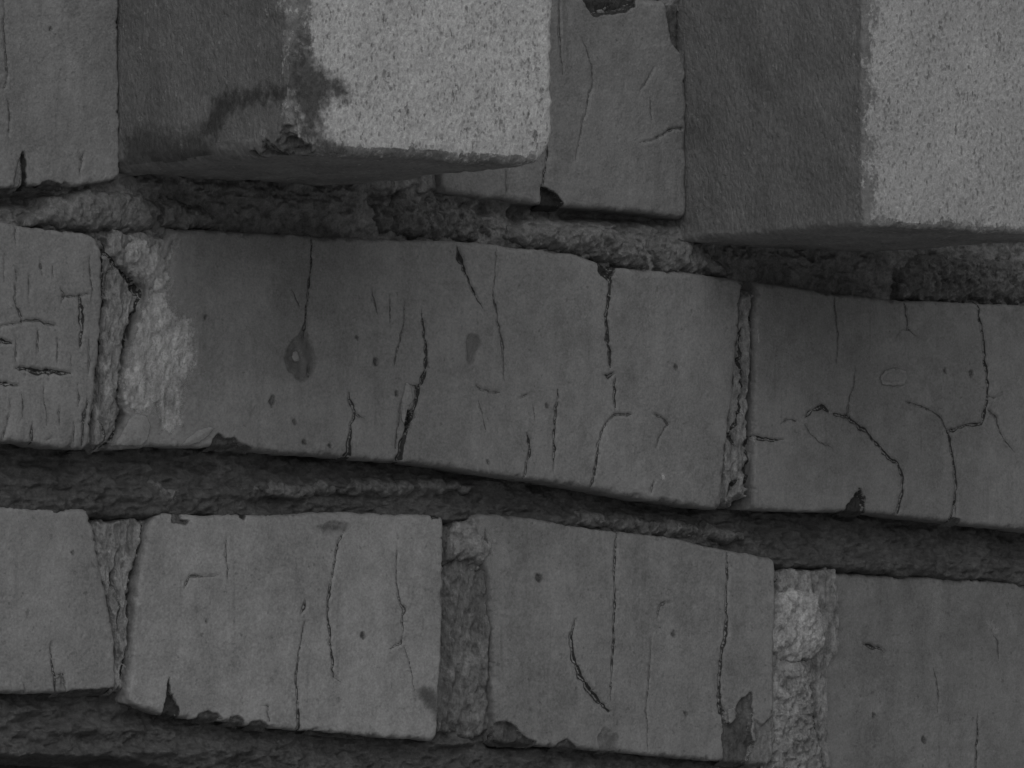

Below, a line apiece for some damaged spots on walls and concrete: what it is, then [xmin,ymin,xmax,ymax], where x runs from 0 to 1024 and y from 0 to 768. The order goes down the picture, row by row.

crack [558,3,593,154]
crack [0,229,142,450]
crack [292,236,312,337]
crack [372,291,428,464]
crack [590,266,669,487]
crack [726,295,904,514]
crack [908,301,1014,523]
crack [293,534,343,732]
crack [390,552,415,691]
crack [569,533,618,713]
crack [716,552,729,715]
peeling [714,692,754,767]